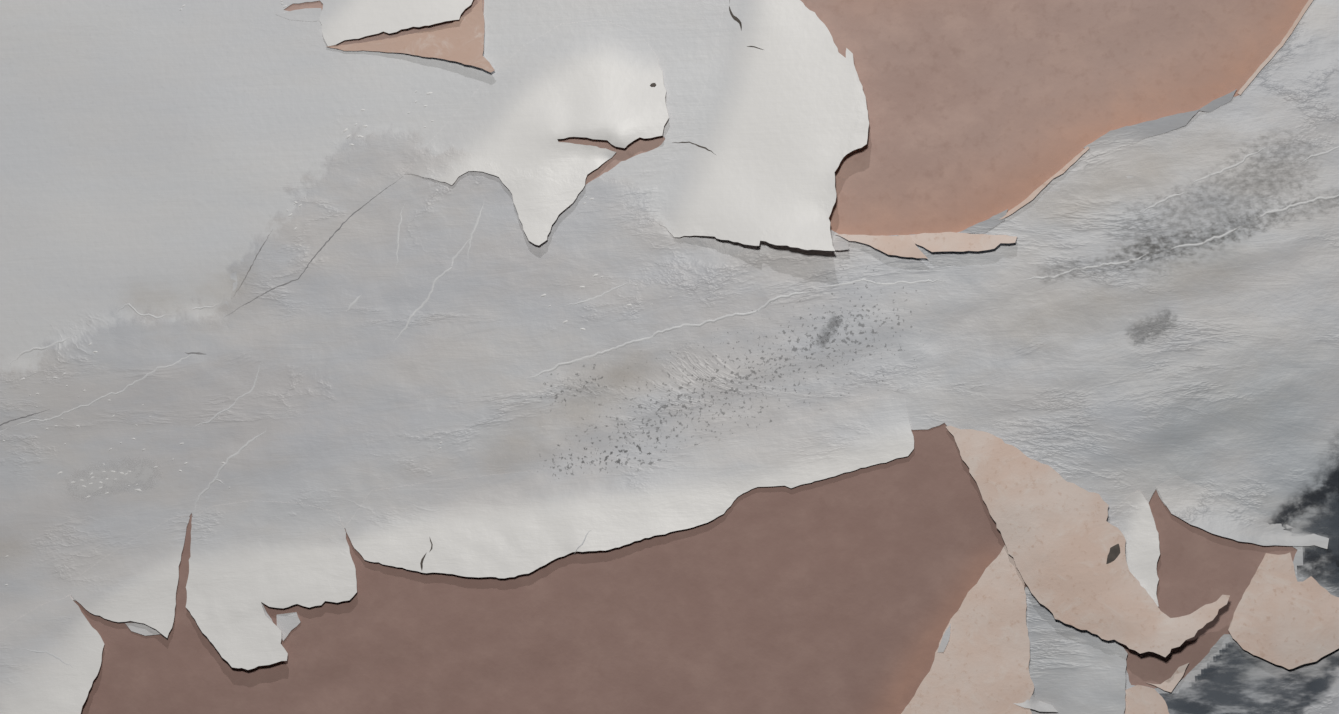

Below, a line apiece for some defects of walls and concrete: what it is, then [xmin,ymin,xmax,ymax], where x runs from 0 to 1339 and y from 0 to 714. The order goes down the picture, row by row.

peeling [276,0,1313,258]
crack [1134,143,1271,213]
crack [114,180,404,319]
crack [394,204,484,341]
crack [525,279,946,379]
crack [1024,194,1339,282]
crack [0,352,204,433]
peeling [0,398,1339,714]
damp [1272,470,1339,586]
damp [1159,646,1339,714]